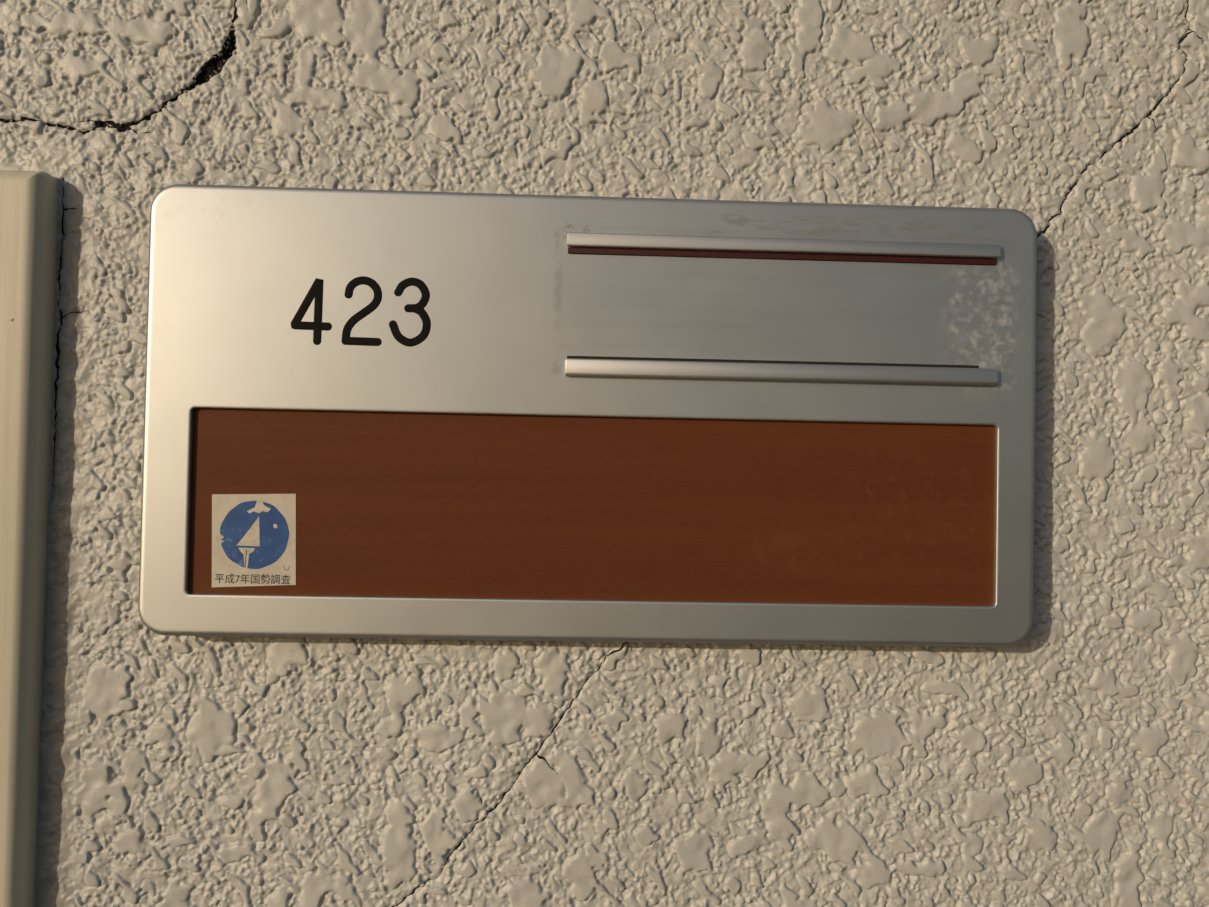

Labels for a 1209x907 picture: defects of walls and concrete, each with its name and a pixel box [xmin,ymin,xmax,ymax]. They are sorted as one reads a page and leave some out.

crack [0,0,248,135]